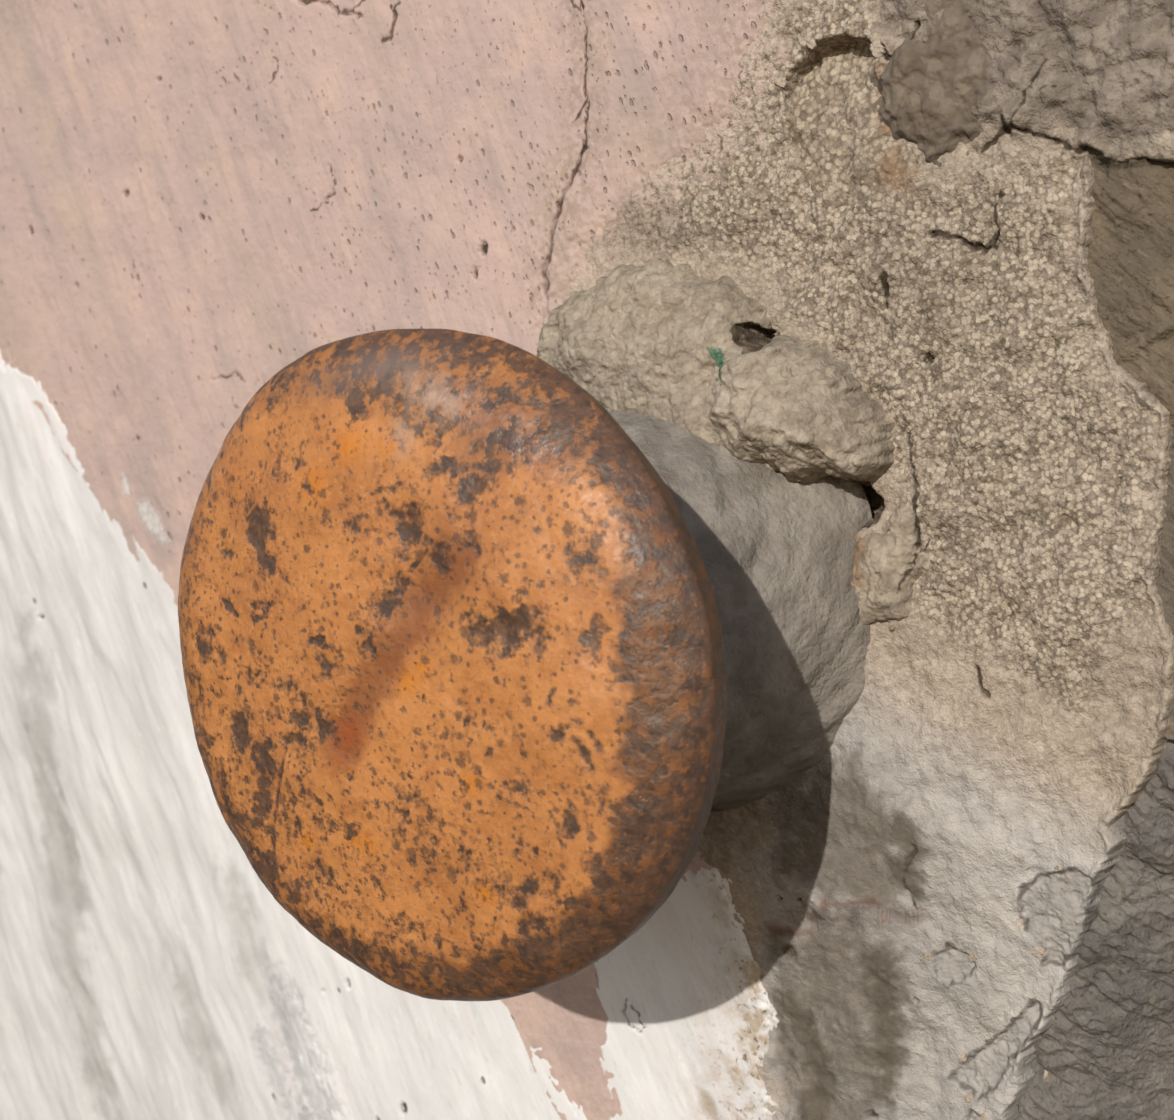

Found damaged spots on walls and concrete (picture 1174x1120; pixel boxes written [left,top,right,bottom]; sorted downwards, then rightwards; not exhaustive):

crack [300,0,401,44]
crack [543,0,590,290]
crack [931,190,1004,253]
spalling [1087,149,1174,635]
peeling [507,972,621,1120]
spalling [951,700,1174,1120]